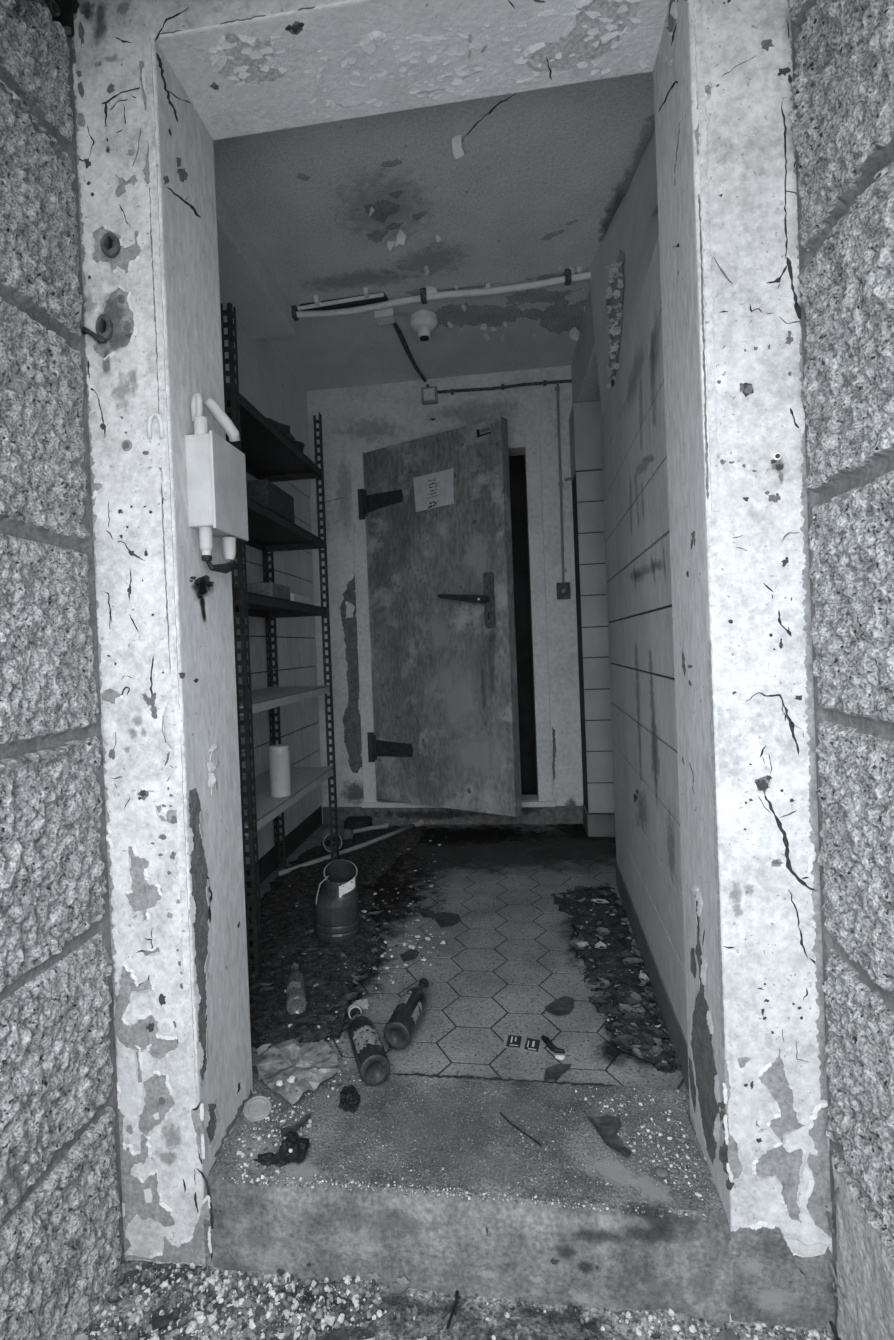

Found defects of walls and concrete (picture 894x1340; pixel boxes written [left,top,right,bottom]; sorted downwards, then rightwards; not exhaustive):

peeling [208,21,304,90]
crack [220,6,315,24]
peeling [513,0,673,83]
crack [102,7,201,413]
peeling [605,251,624,388]
crack [658,81,801,498]
crack [105,484,171,697]
peeling [106,744,220,1163]
crack [682,641,734,1049]
crack [747,692,817,1000]
peeling [114,963,221,1267]
spalling [688,890,835,1329]